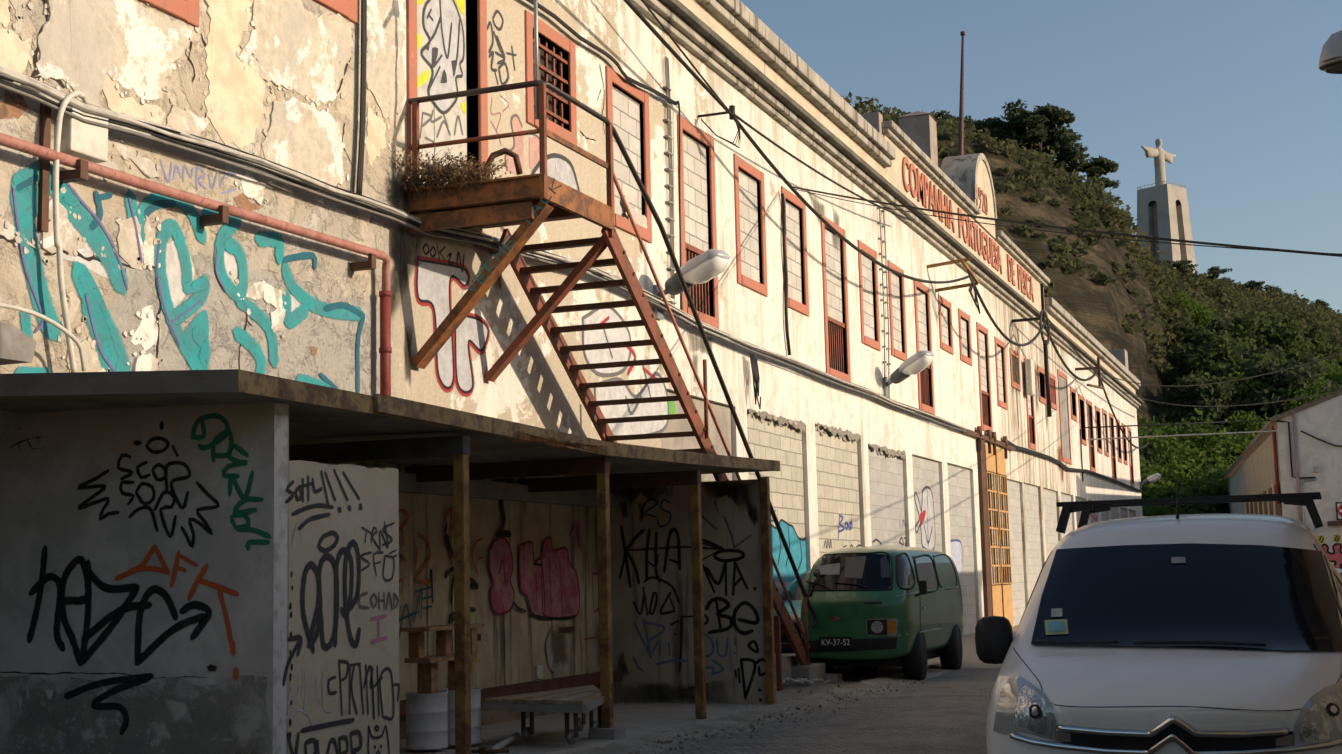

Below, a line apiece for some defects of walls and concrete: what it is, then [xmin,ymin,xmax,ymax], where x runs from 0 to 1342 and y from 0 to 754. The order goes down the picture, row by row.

crack [188,33,207,83]
peeling [0,0,407,211]
peeling [0,187,161,272]